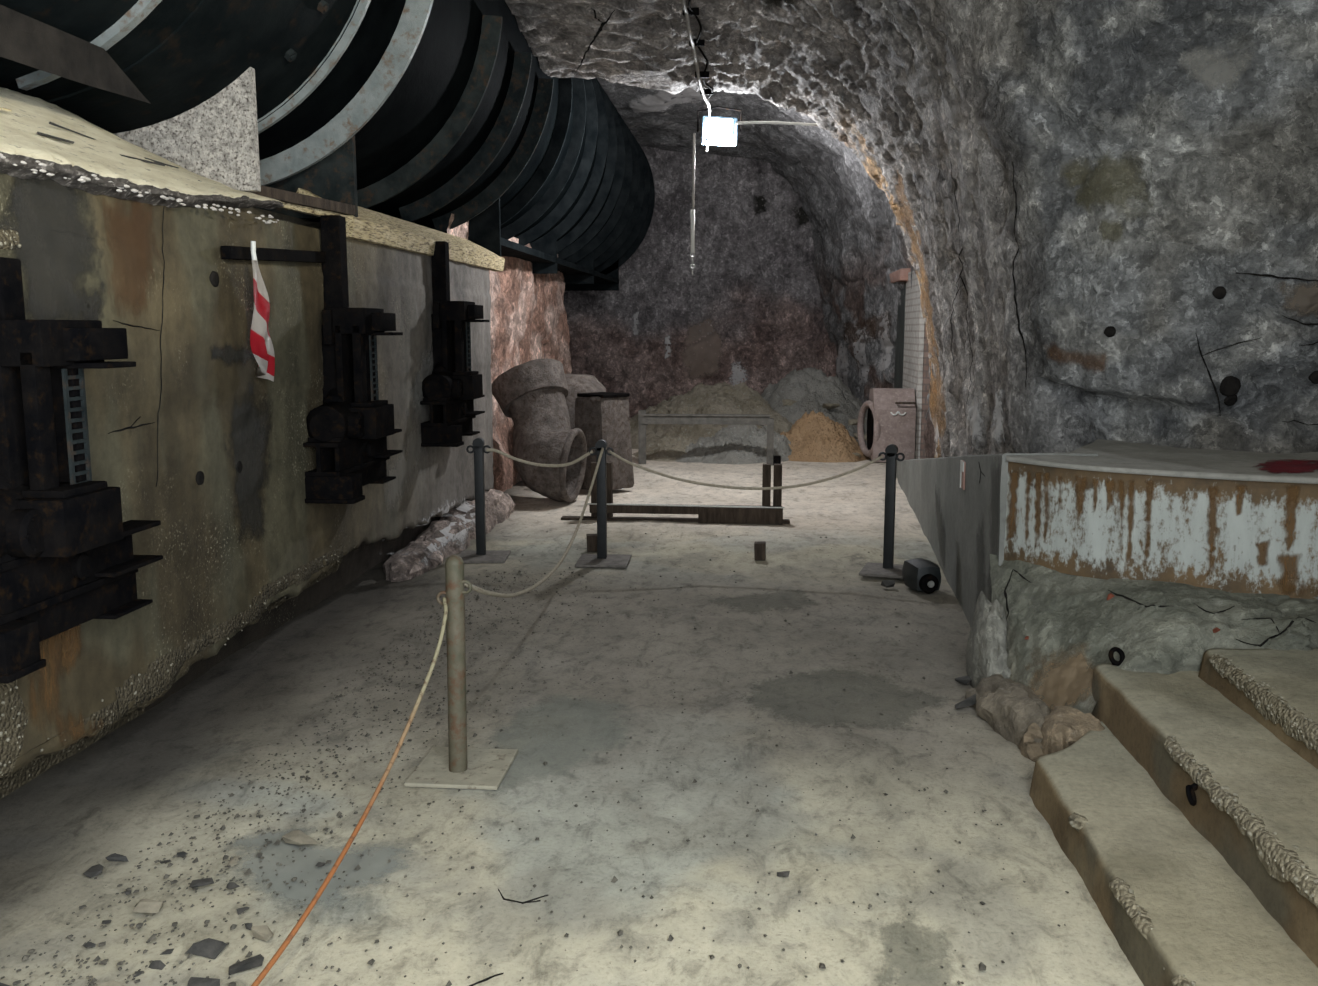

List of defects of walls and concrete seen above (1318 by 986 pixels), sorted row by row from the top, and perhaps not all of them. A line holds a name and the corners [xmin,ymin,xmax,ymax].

spalling [0,152,284,224]
spalling [0,226,21,250]
rust [1007,471,1153,562]
rust [1207,487,1217,575]
rust [1235,486,1246,515]
rust [1256,485,1304,593]
spalling [0,544,358,799]
spalling [1209,653,1318,754]
spalling [1068,812,1088,832]
spalling [1163,735,1318,908]
spalling [1109,877,1154,939]
spalling [1163,967,1196,986]